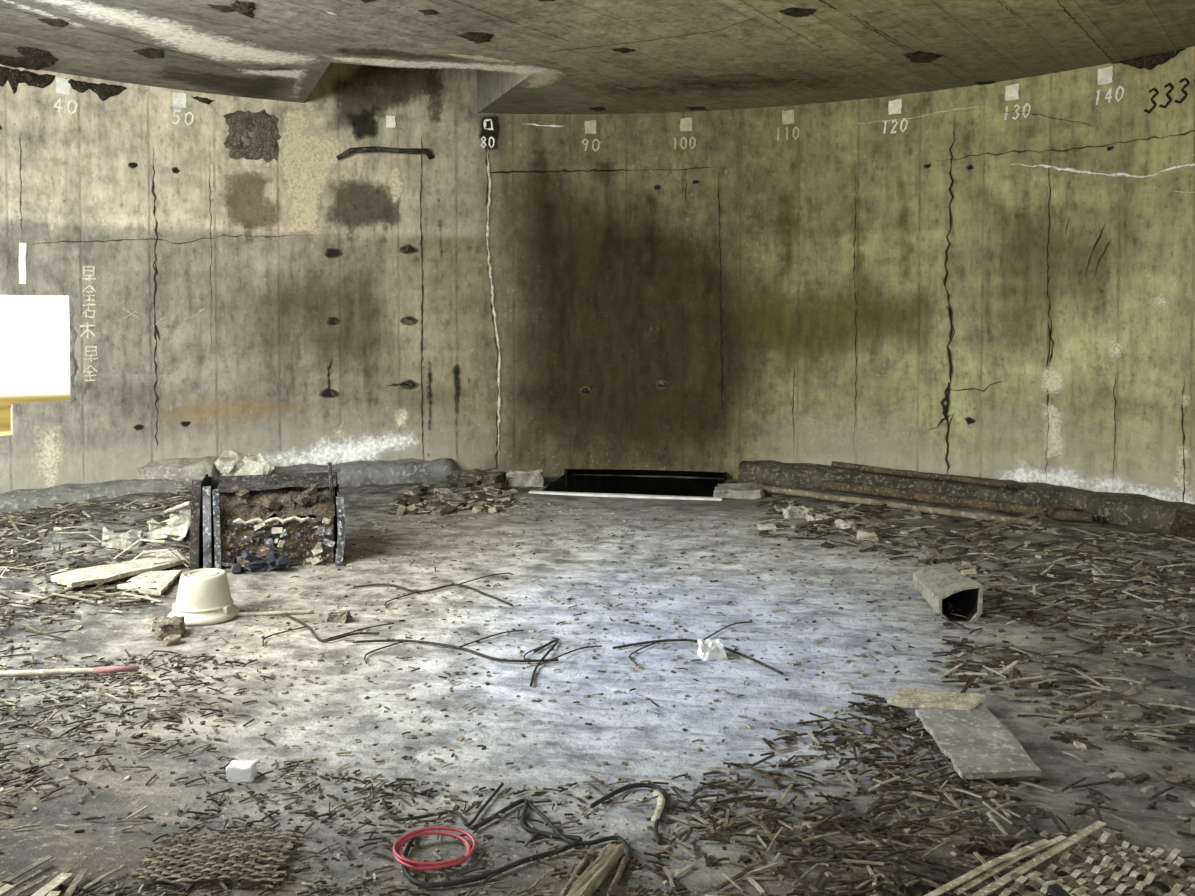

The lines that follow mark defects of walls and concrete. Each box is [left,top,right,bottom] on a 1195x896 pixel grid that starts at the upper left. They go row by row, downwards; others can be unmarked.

spalling [0,46,127,101]
spalling [207,1,256,19]
crack [819,0,965,81]
crack [1057,0,1113,62]
leakage [228,173,276,242]
peeling [223,100,344,233]
leakage [329,181,399,228]
peeling [390,167,403,202]
leakage [528,184,747,441]
crack [928,111,1195,479]
leakage [264,412,416,467]
leakage [1000,367,1195,504]